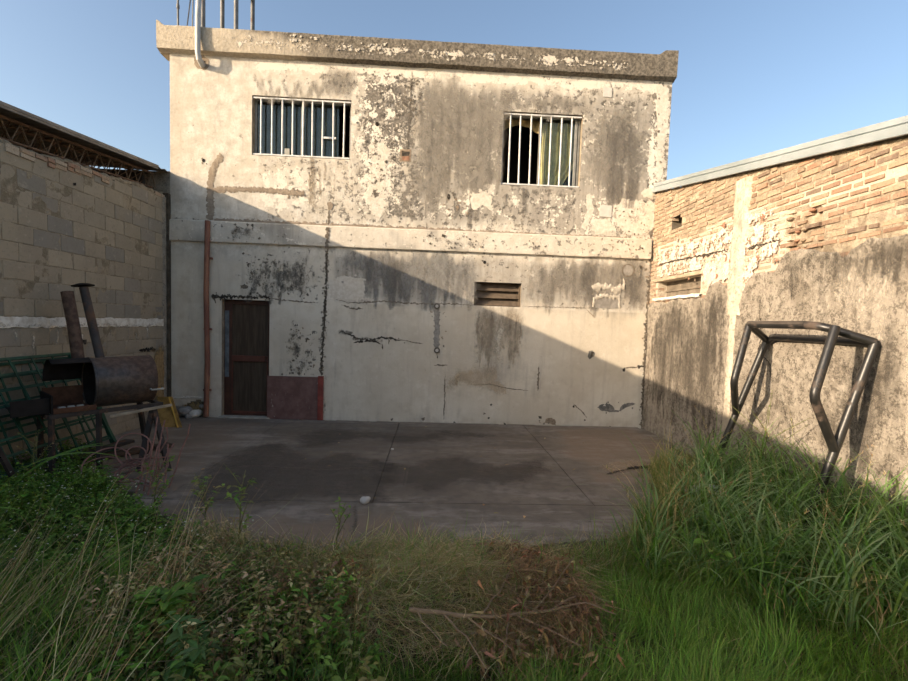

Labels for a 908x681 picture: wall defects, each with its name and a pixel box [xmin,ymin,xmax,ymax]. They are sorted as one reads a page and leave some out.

peeling [268,34,387,52]
damp [403,78,516,220]
peeling [581,82,733,288]
damp [231,223,309,304]
crack [211,202,471,376]
damp [355,251,474,311]
damp [539,259,642,311]
peeling [740,207,779,293]
damp [838,243,908,340]
spalling [597,402,635,414]
damp [651,300,722,435]
damp [851,357,893,478]